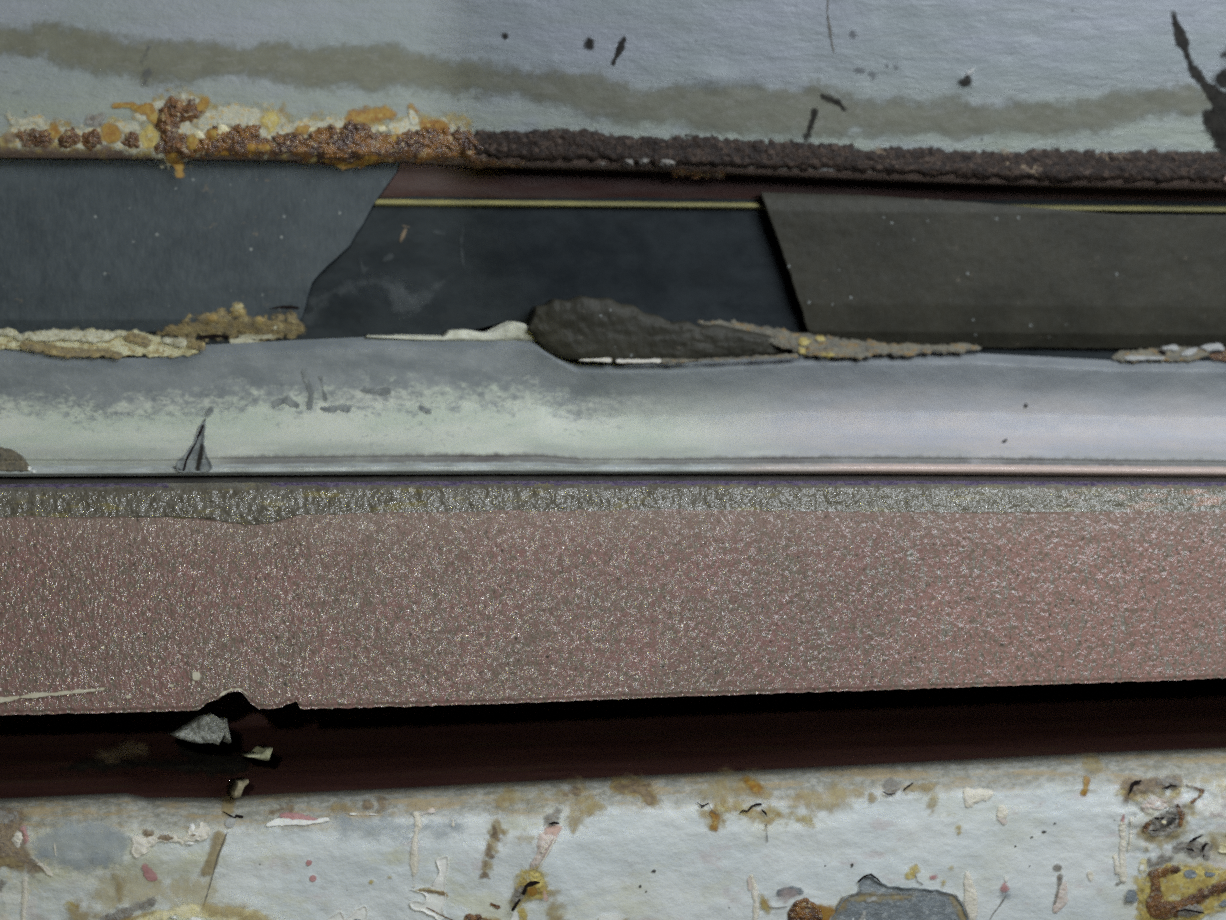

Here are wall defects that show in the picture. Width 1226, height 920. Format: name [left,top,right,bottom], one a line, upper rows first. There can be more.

leakage [0,23,1211,140]
corrosion [0,92,1226,184]
peeling [0,328,205,359]
peeling [208,303,279,343]
peeling [238,745,273,761]
corrosion [1126,848,1226,920]